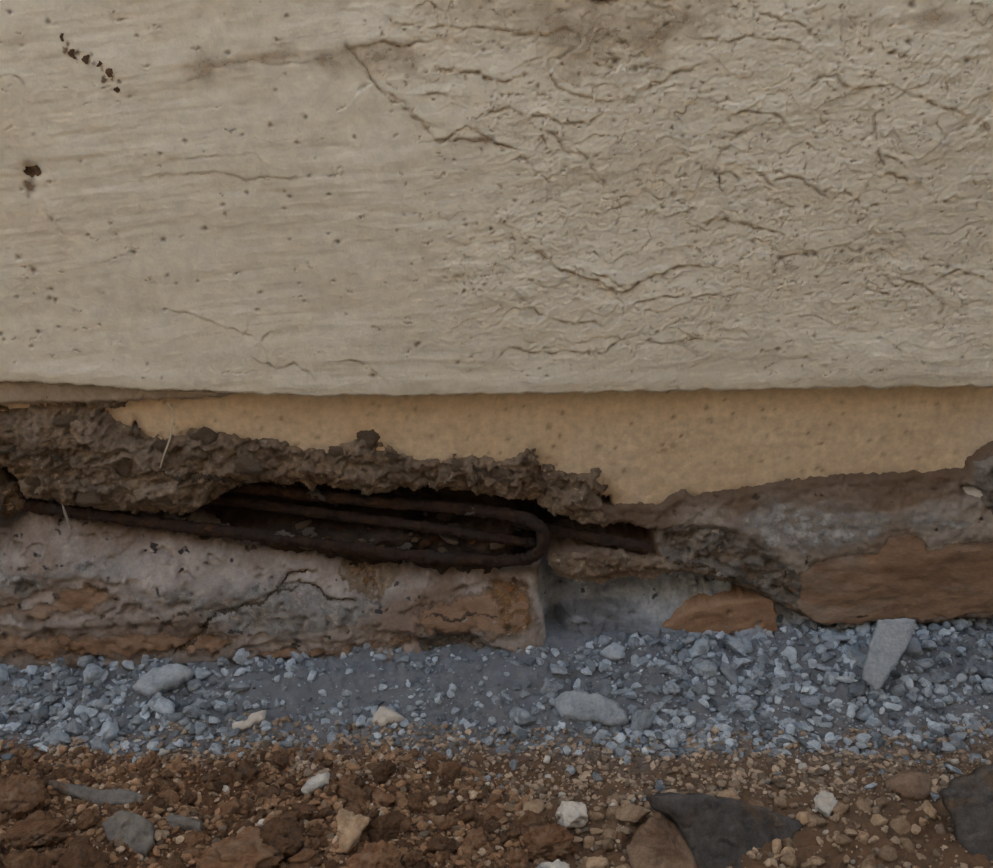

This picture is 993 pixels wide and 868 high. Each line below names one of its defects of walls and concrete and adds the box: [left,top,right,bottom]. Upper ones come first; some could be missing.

spalling [0,396,608,528]
spalling [963,456,993,514]
peeling [0,579,229,660]
crack [174,569,356,653]
peeling [259,525,993,659]